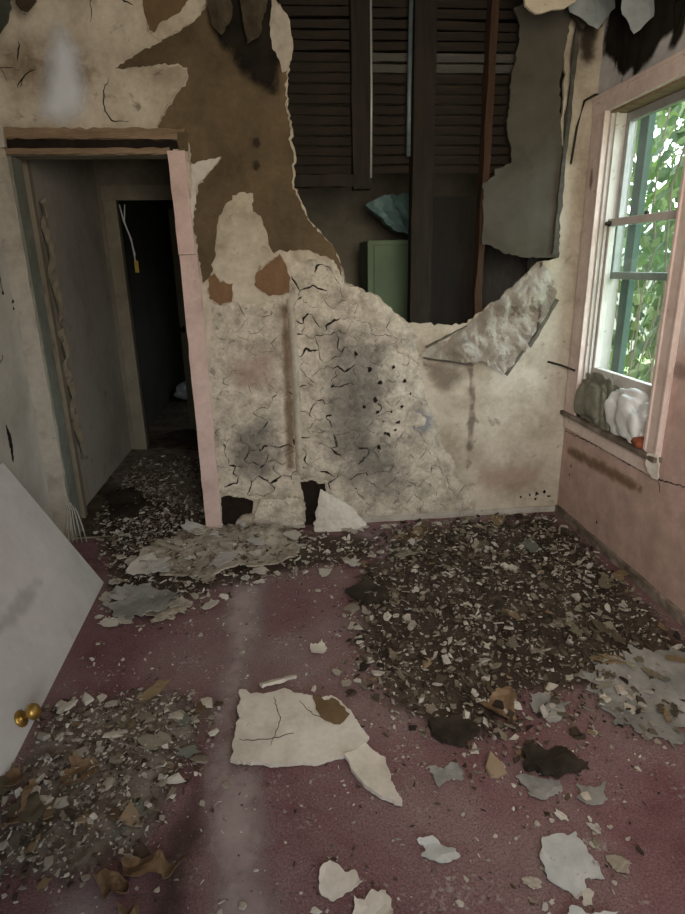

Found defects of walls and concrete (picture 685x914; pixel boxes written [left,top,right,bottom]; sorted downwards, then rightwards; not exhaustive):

crack [1,41,35,88]
crack [103,83,128,122]
flaking render [115,0,342,306]
damp [431,362,475,450]
crack [564,431,685,493]
flaking render [221,491,255,526]
flaking render [297,477,328,547]